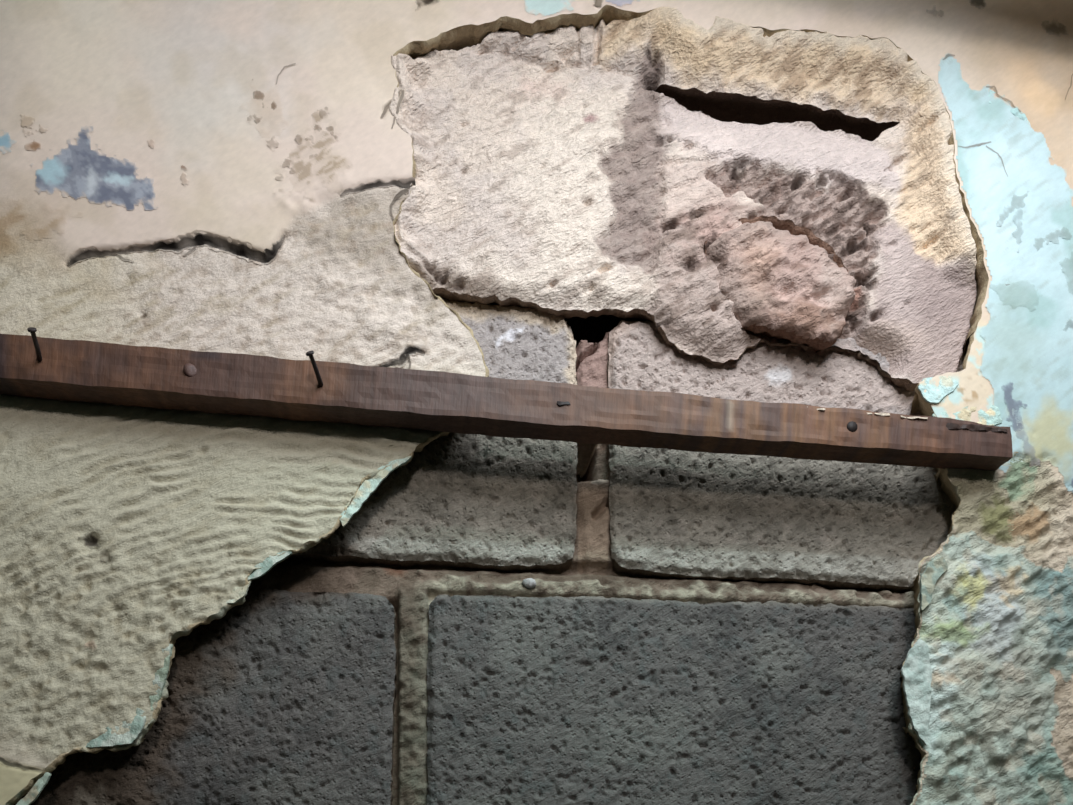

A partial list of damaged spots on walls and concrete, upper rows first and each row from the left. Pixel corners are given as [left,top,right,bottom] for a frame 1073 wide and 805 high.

peeling [30,125,158,211]
crack [66,229,286,267]
spalling [389,0,1073,493]
spalling [5,432,1073,805]